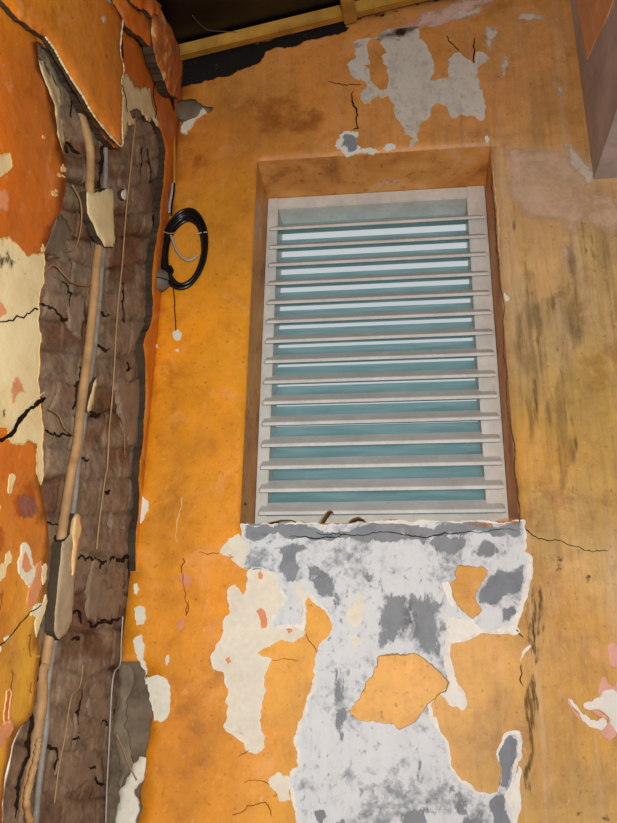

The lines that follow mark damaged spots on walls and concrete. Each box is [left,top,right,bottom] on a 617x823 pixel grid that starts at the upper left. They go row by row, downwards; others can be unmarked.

crack [328,81,361,130]
peeling [347,0,498,148]
peeling [335,131,396,157]
crack [0,308,38,322]
crack [296,164,608,552]
crack [0,392,46,442]
spalling [0,43,171,823]
crack [0,603,42,652]
damp [529,589,544,663]
peeling [210,510,533,823]
damp [524,677,539,785]
peeling [568,677,617,740]